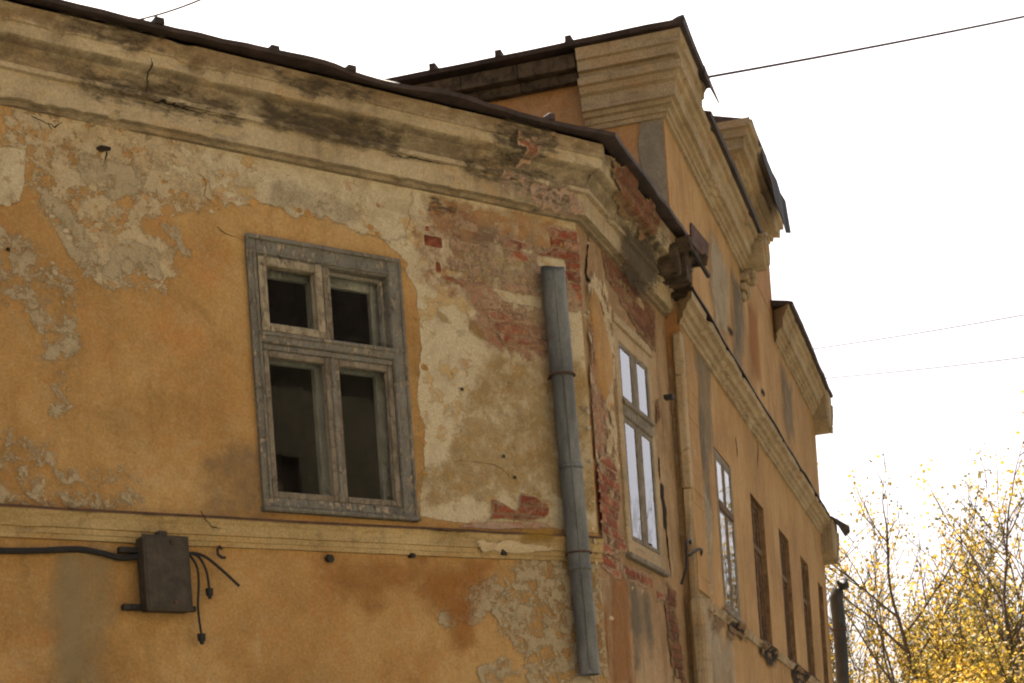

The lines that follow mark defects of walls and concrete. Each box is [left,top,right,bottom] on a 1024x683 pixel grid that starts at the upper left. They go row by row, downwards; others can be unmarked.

leakage [62,13,165,51]
leakage [79,65,243,127]
crack [146,58,226,119]
leakage [263,62,374,102]
leakage [262,95,401,154]
leakage [465,118,568,209]
flaking render [0,106,687,683]